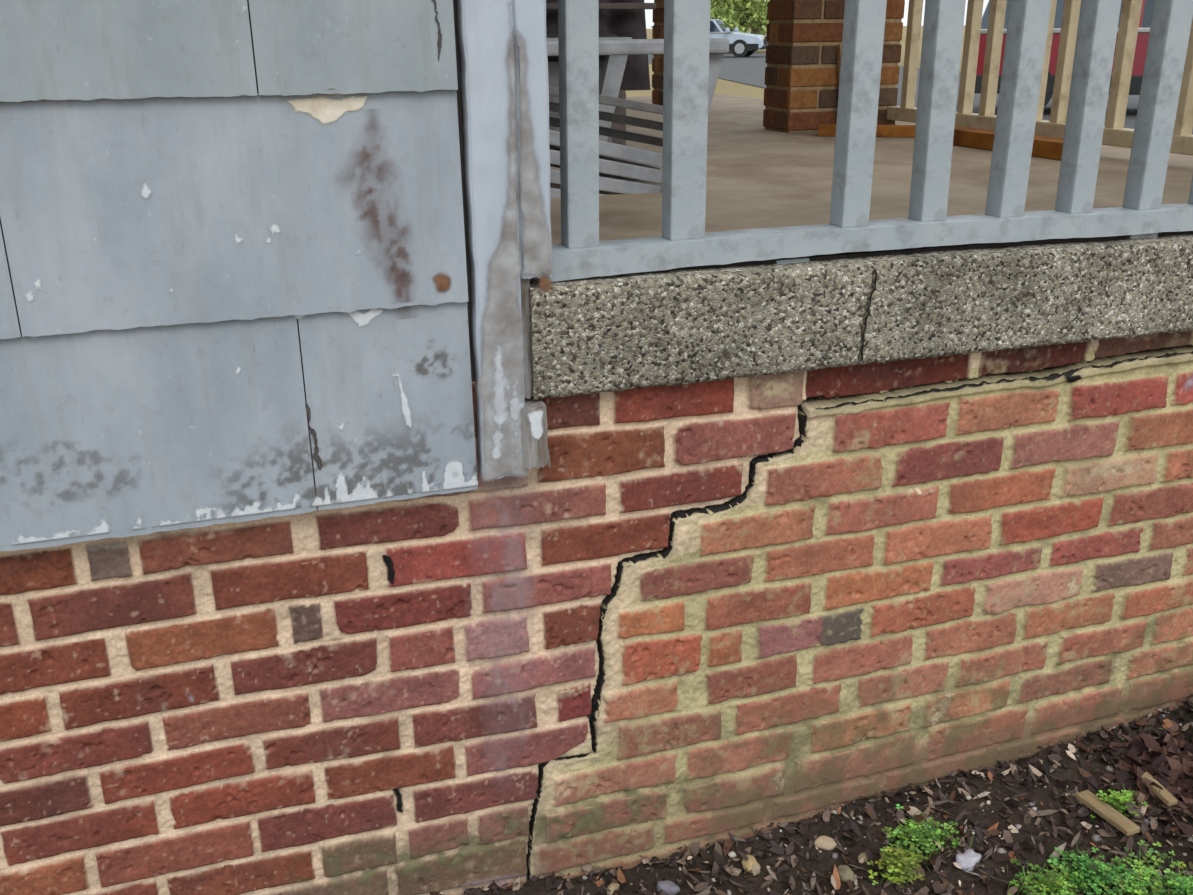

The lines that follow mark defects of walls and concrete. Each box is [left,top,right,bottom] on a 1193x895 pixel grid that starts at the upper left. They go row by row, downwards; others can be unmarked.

crack [432,0,442,61]
peeling [287,88,367,124]
rust [368,189,404,235]
rust [391,267,408,302]
rust [434,274,450,292]
peeling [408,30,552,494]
crack [861,271,877,361]
peeling [392,373,412,427]
crack [305,404,323,470]
peeling [132,472,393,530]
peeling [13,520,109,545]
crack [526,351,1193,879]